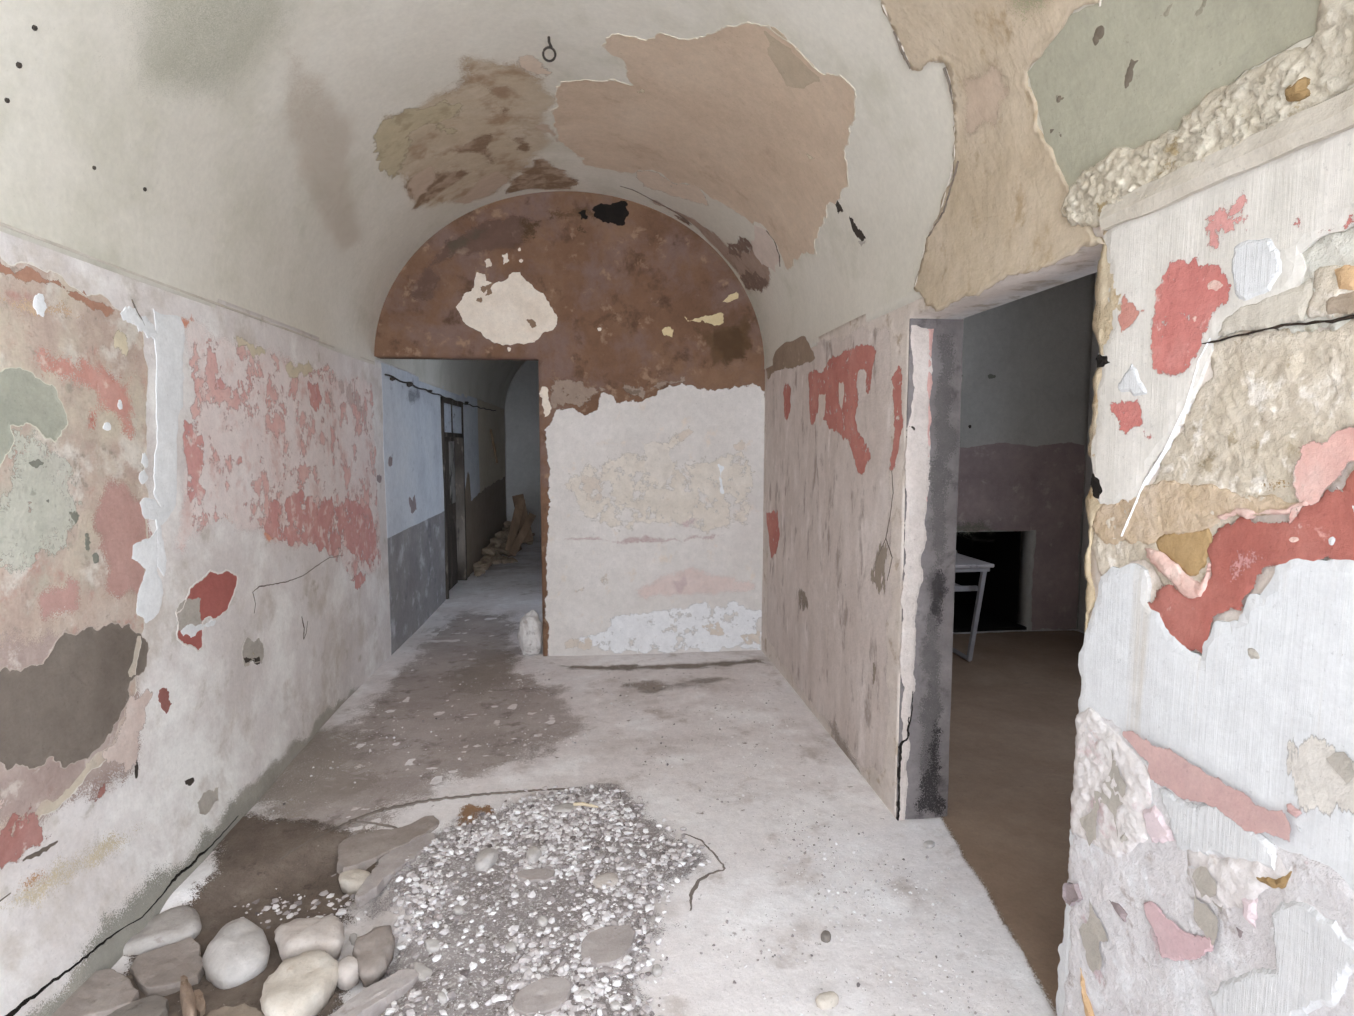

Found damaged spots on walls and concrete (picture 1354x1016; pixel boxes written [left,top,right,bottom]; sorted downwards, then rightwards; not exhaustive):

flaking render [551,21,866,272]
peeling [0,256,172,870]
peeling [172,314,393,590]
peeling [766,510,780,558]
peeling [766,336,876,474]
spalling [879,0,1354,654]
crack [1201,315,1354,344]
crack [5,816,238,1016]
spalling [1062,717,1354,1016]